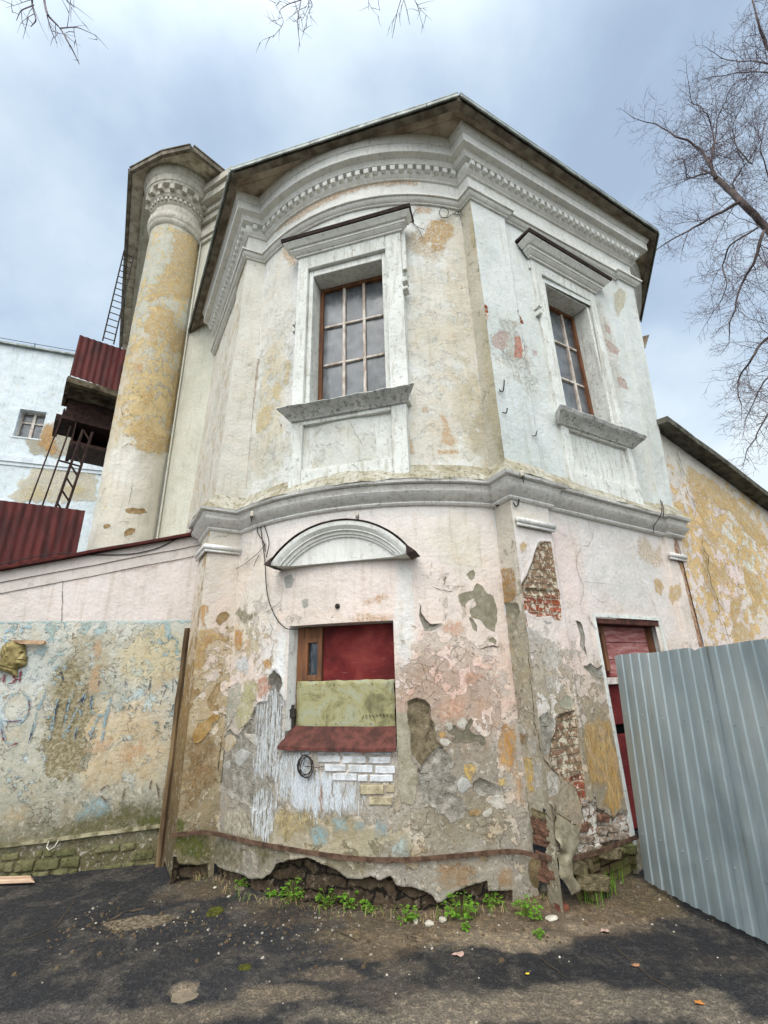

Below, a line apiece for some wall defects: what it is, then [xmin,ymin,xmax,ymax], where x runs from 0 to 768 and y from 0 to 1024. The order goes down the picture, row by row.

peeling [492,331,537,358]
flaking render [458,541,561,692]
spalling [220,671,285,842]
spalling [407,699,506,823]
crack [525,644,578,826]
flaking render [516,696,631,854]
spalling [170,857,513,910]